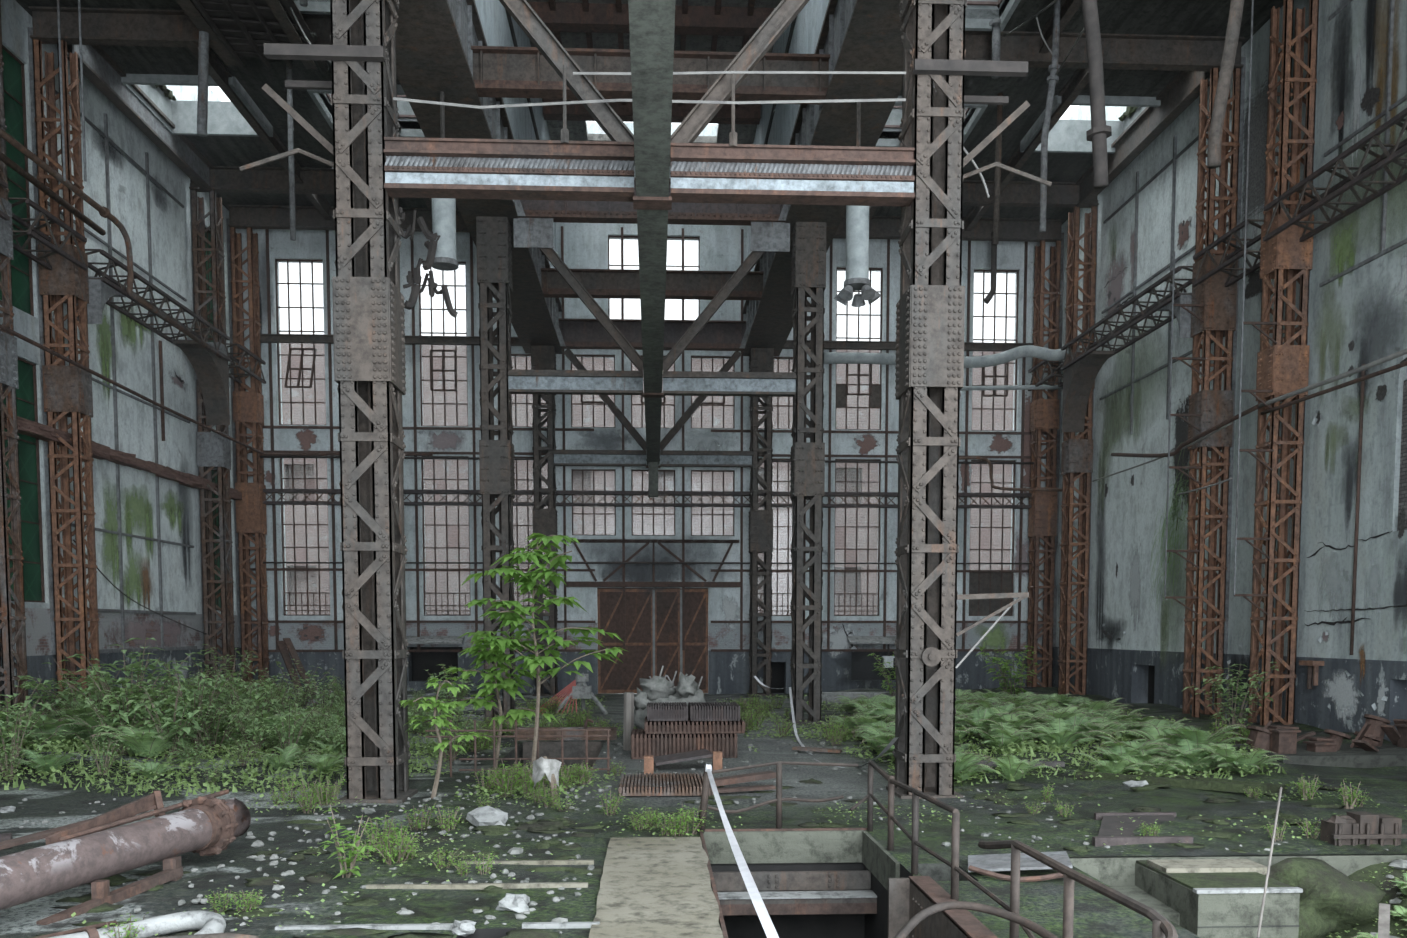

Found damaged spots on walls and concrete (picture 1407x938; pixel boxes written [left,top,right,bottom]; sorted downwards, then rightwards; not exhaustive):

corrosion [3,414,209,486]
damp [112,505,153,605]
damp [170,471,190,575]
crack [1307,531,1392,558]
spalling [1398,508,1406,539]
crack [1304,605,1407,626]
peeling [1324,670,1389,721]